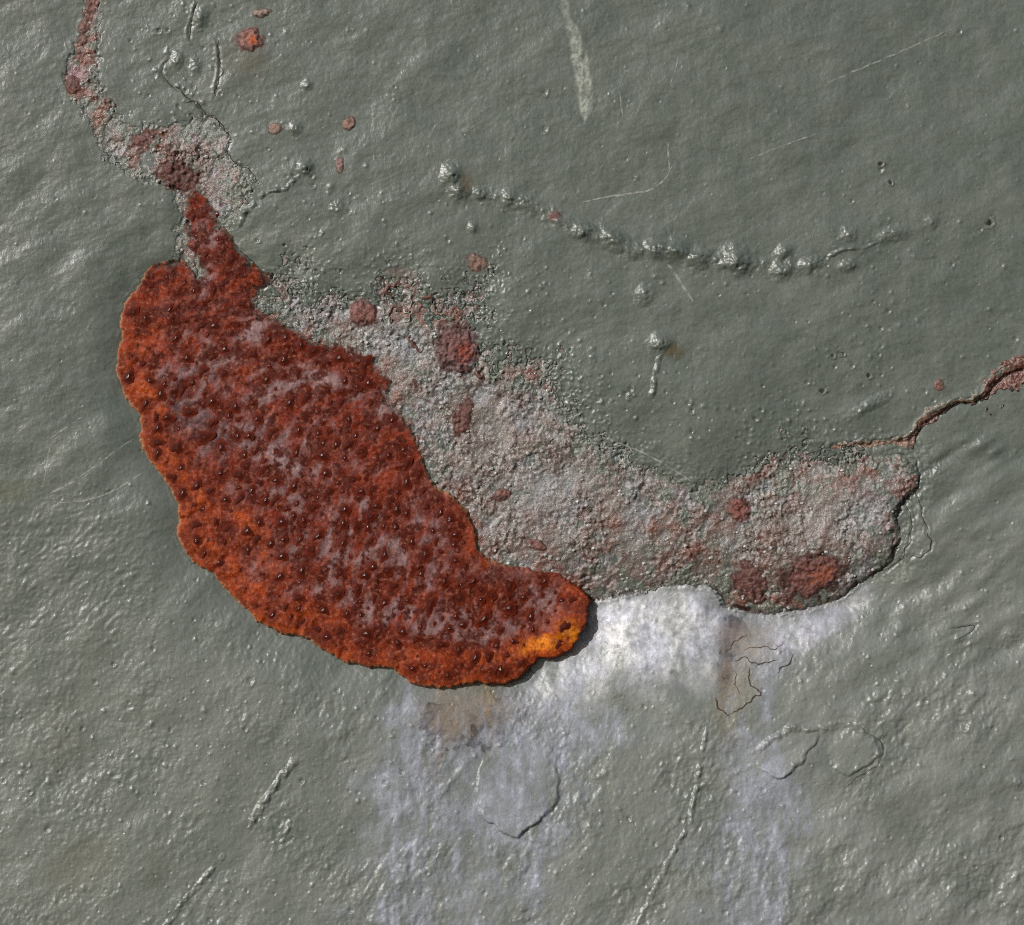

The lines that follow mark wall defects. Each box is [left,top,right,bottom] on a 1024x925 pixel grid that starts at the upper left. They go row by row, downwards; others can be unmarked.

corrosion [233,8,272,52]
peeling [62,0,259,281]
corrosion [116,189,594,689]
peeling [249,253,921,616]
crack [831,355,1024,450]
leakage [741,602,855,675]
leakage [376,745,422,821]
leakage [469,592,724,890]
leakage [378,900,407,925]
leakage [390,838,418,873]
leakage [723,823,785,918]